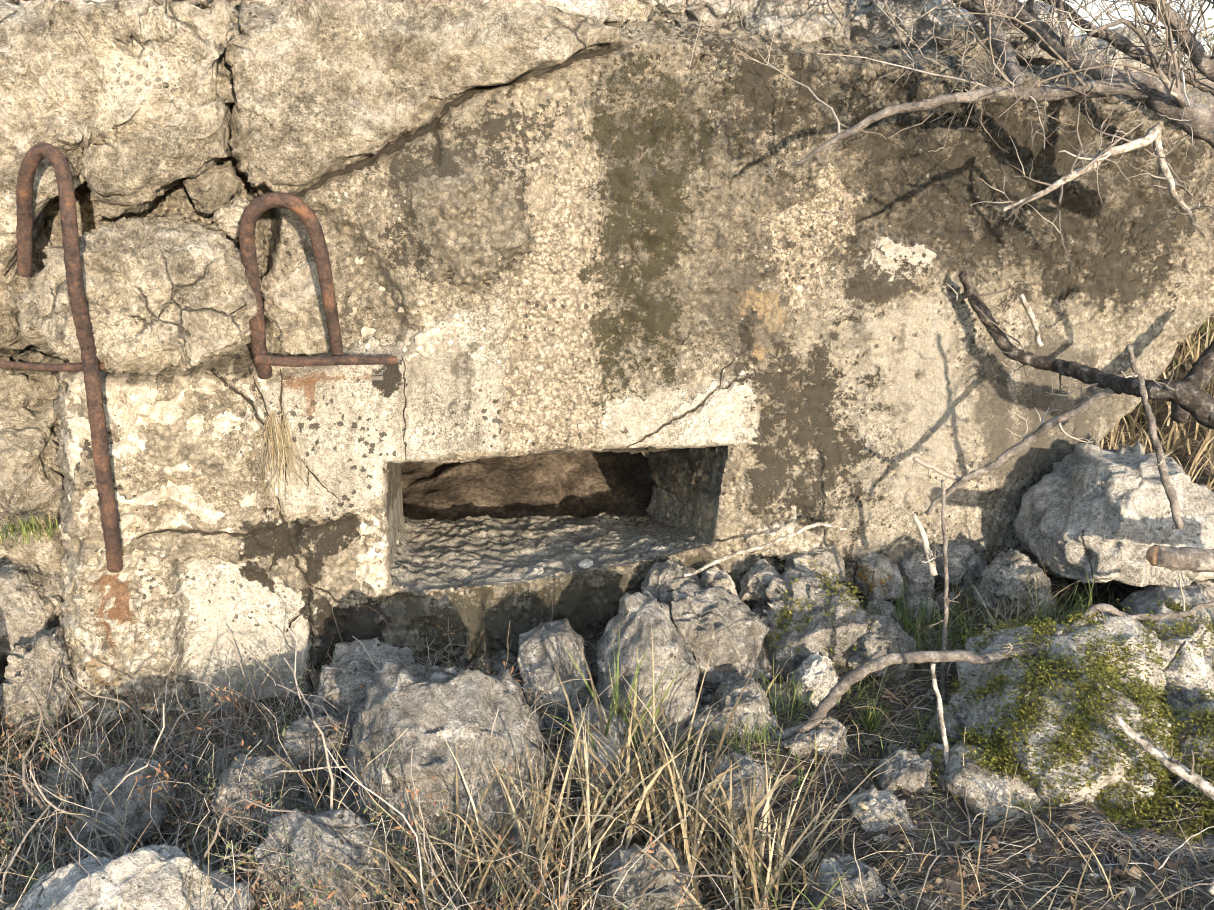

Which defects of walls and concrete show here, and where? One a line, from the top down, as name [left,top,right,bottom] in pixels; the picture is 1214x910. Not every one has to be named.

rust [0,142,133,688]
rust [239,192,397,416]
leakage [364,83,568,292]
crack [628,355,747,447]
leakage [573,26,1214,568]